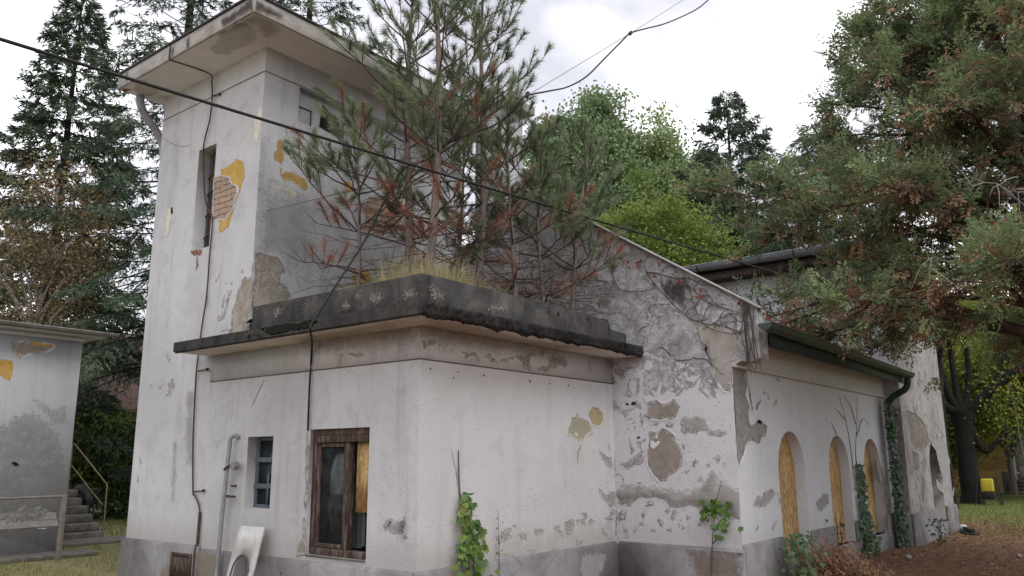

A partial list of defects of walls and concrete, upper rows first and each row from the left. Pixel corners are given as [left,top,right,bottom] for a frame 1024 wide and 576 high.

peeling [274,140,308,190]
flaking render [212,159,244,233]
flaking render [217,251,293,339]
flaking render [0,340,56,381]
flaking render [462,348,572,372]
flaking render [599,302,777,484]
flaking render [566,404,603,463]
flaking render [384,517,406,539]